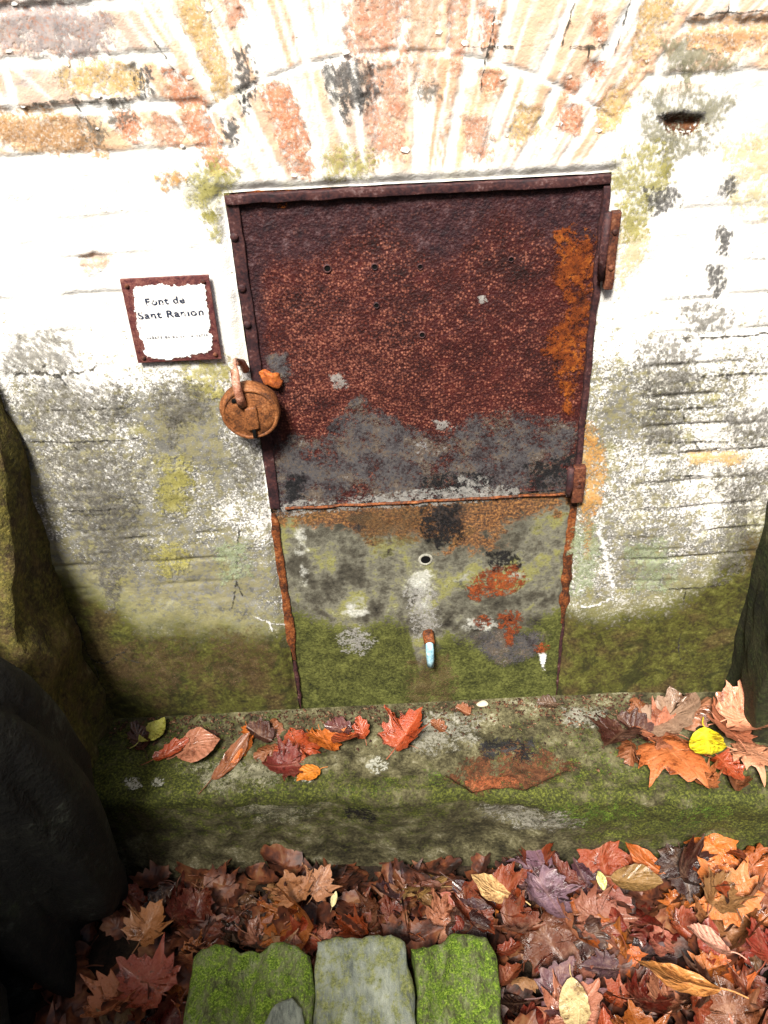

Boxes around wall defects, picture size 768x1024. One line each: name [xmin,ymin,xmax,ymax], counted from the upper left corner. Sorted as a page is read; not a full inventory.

mould [321,56,384,125]
corrosion [540,224,598,414]
water stain [633,224,735,445]
water stain [150,380,212,450]
water stain [0,328,153,613]
water stain [226,435,264,494]
corrosion [576,421,608,560]
corrosion [465,564,529,602]
efflorescence [581,521,616,608]
corrosion [473,609,523,646]